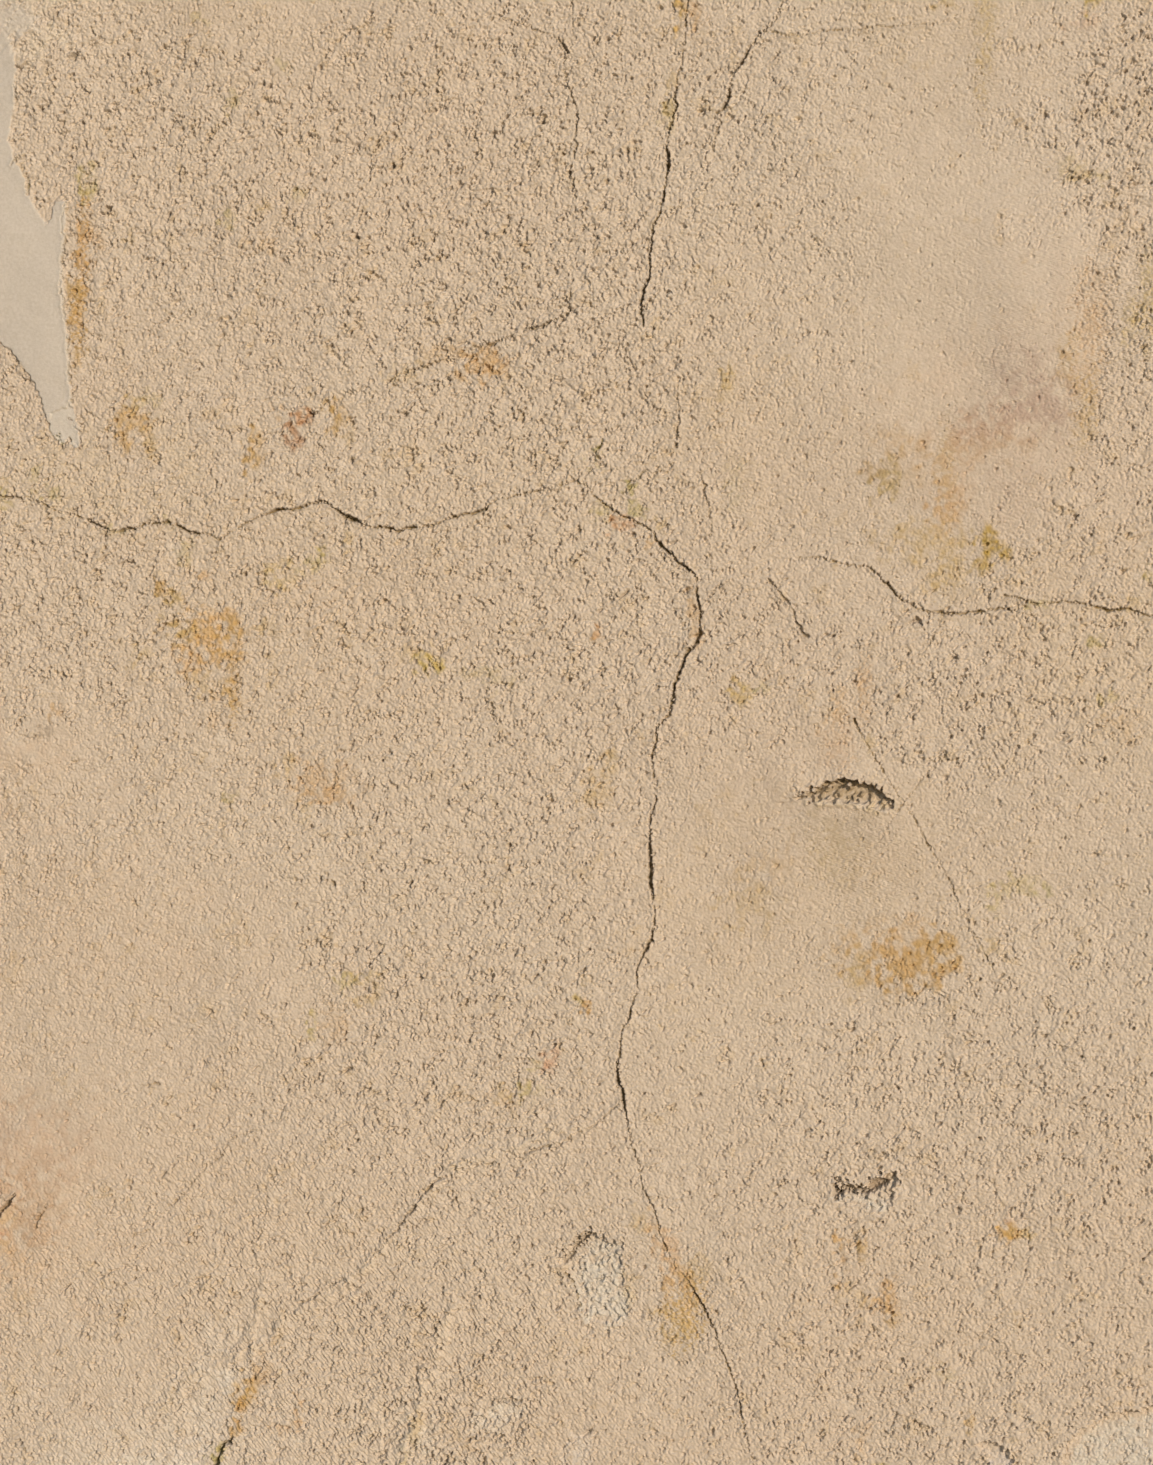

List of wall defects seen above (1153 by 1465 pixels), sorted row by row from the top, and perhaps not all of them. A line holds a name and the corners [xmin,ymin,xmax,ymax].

crack [12,65,23,103]
crack [10,155,31,195]
crack [498,0,930,328]
crack [58,199,82,450]
crack [385,277,574,386]
crack [0,393,1153,1465]
flaking render [826,1152,902,1218]
flaking render [556,1226,631,1327]